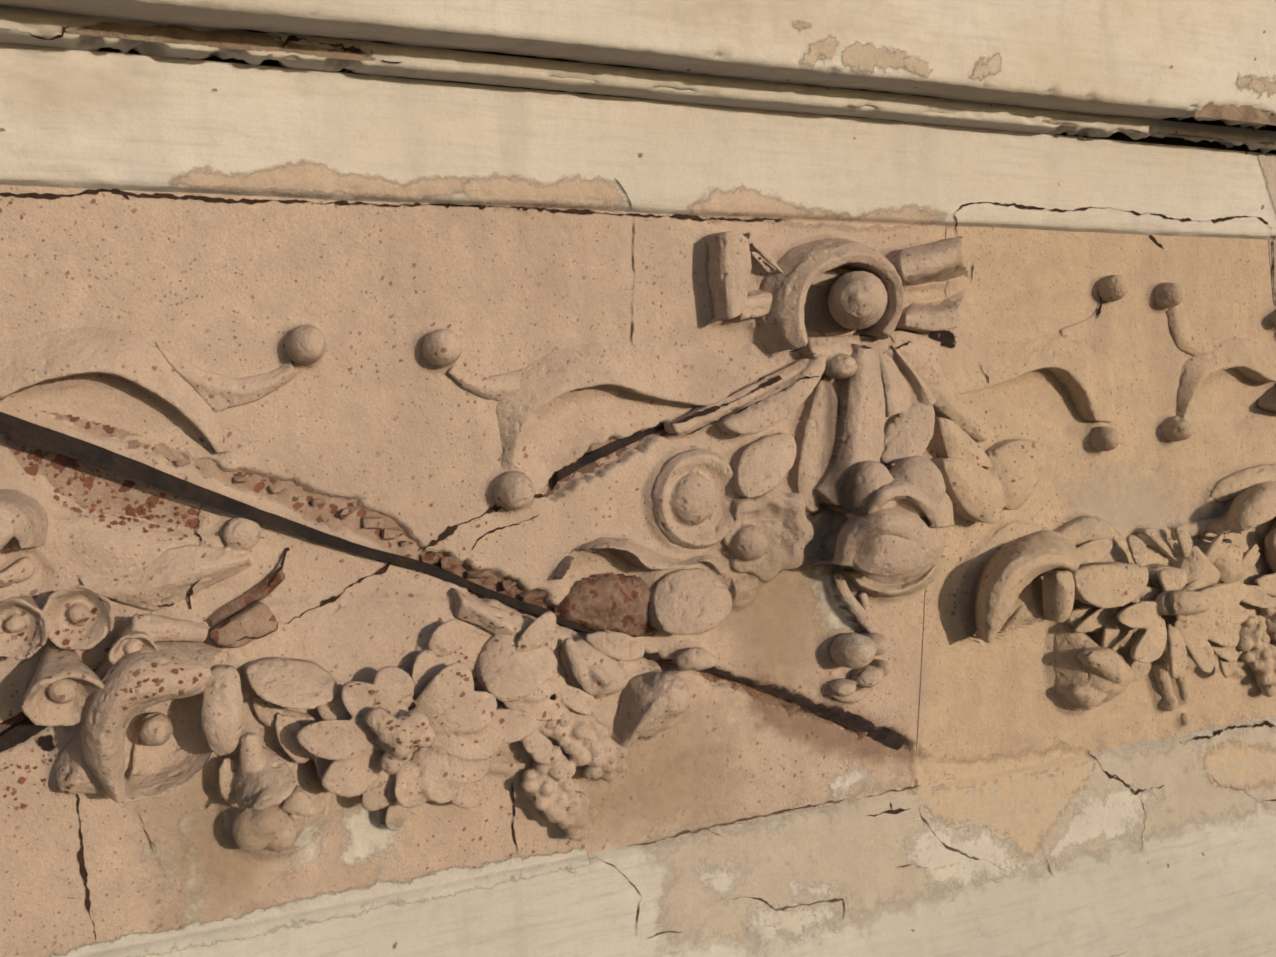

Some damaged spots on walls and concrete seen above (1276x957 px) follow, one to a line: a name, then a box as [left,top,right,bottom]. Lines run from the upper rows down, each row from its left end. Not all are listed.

peeling [800,35,933,78]
peeling [970,53,1002,81]
spalling [1195,74,1276,125]
peeling [170,160,622,213]
crack [954,202,1276,302]
crack [857,330,910,354]
crack [671,347,820,438]
crack [158,494,546,646]
crack [1180,721,1276,745]
crack [1088,750,1164,851]
crack [76,794,96,940]
crack [584,785,1006,939]